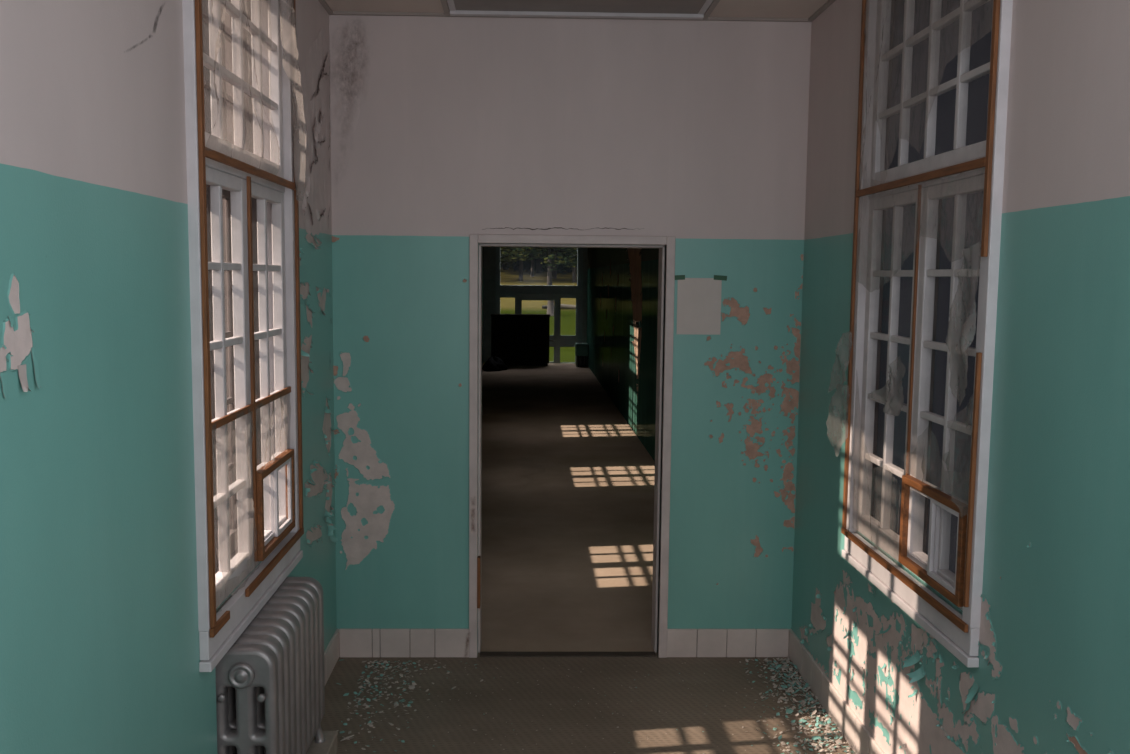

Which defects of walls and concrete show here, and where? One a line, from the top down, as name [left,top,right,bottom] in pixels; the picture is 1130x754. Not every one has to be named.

peeling [0,273,42,399]
peeling [300,281,396,571]
peeling [703,254,804,530]
peeling [739,657,856,754]
peeling [799,569,1055,754]
peeling [1048,700,1094,754]